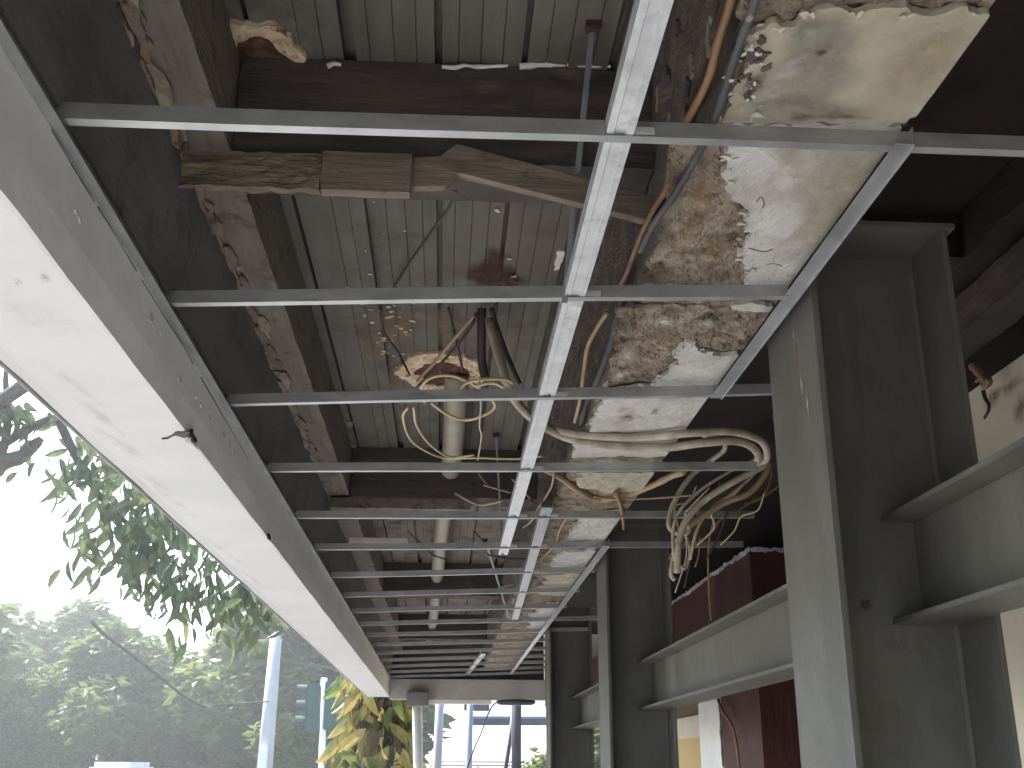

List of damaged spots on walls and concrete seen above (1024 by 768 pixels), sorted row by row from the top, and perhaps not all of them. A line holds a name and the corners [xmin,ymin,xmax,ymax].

spalling [229,18,307,63]
peeling [653,15,713,122]
spalling [721,0,981,121]
spalling [641,144,757,285]
spalling [361,303,483,390]
spalling [607,302,765,387]